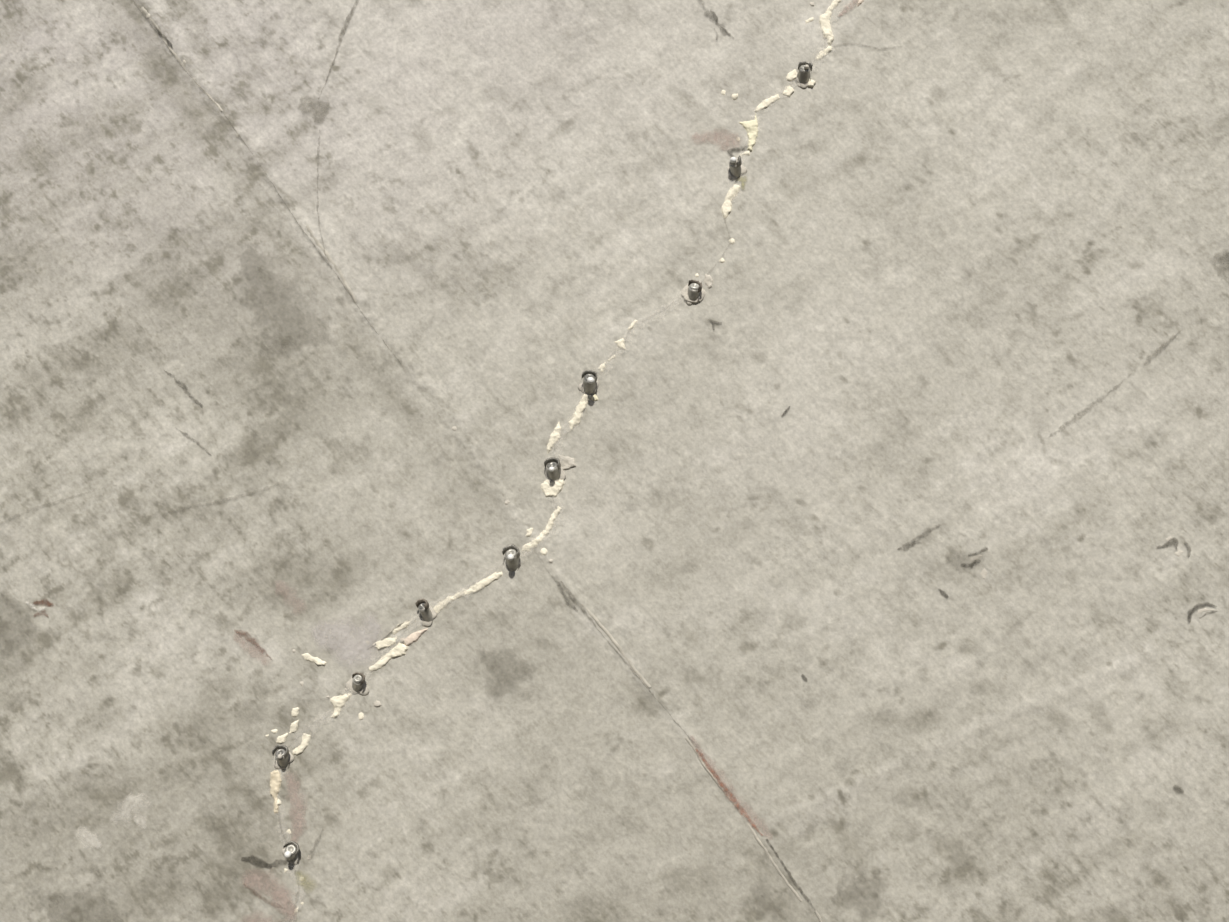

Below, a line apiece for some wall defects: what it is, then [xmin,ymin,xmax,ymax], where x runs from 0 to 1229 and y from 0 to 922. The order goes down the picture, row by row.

crack [141,7,241,138]
crack [372,622,405,649]
crack [685,737,823,922]